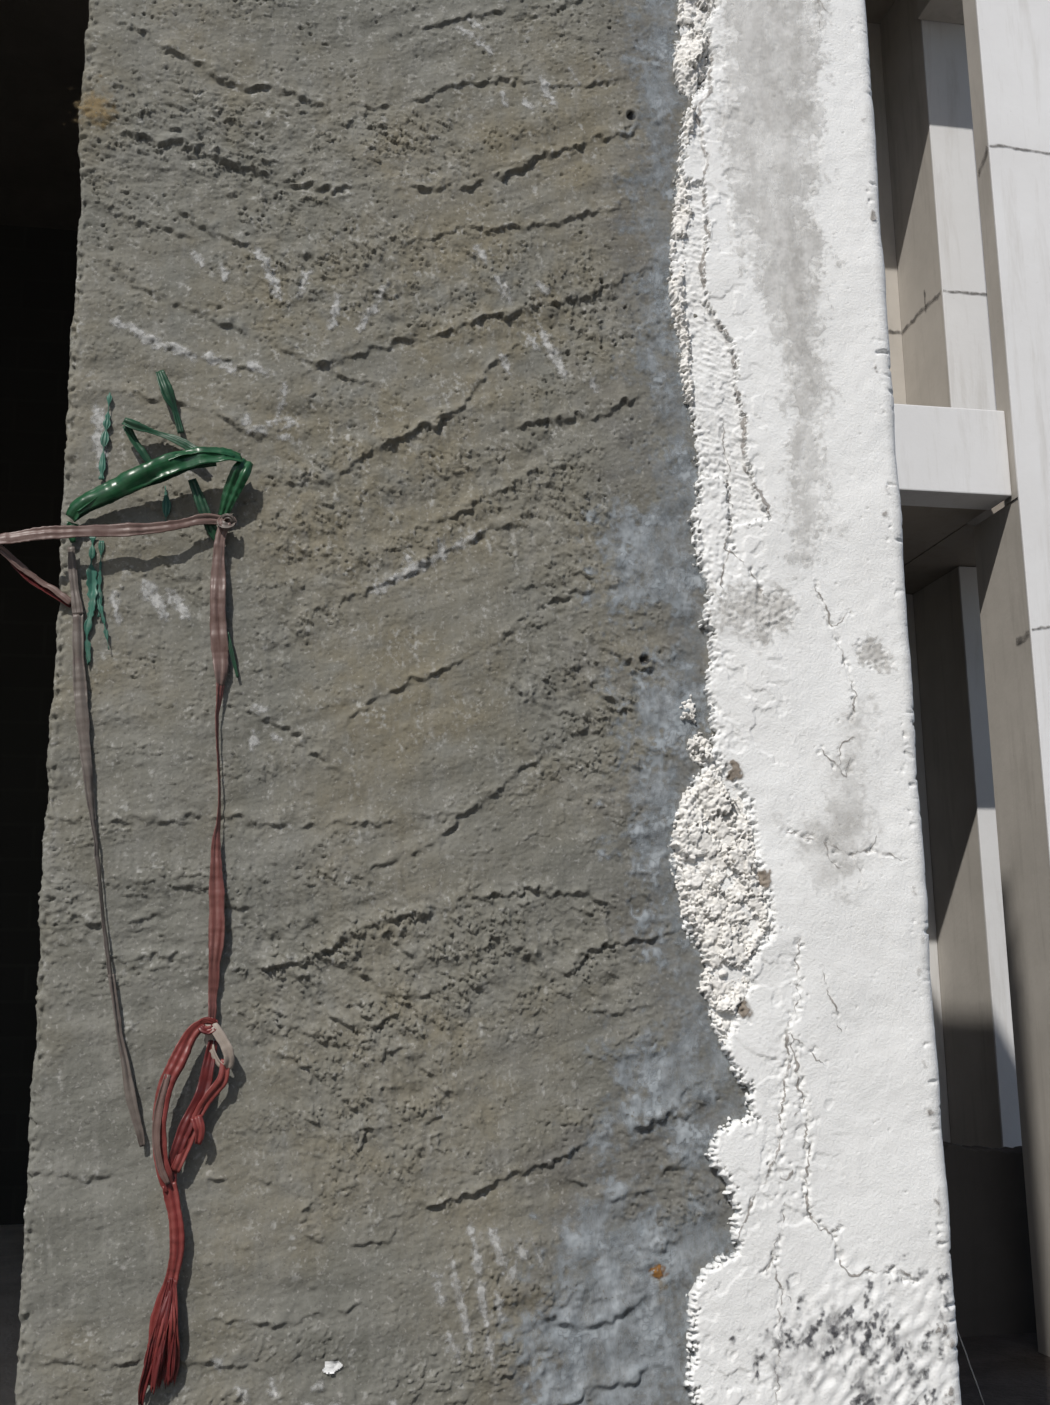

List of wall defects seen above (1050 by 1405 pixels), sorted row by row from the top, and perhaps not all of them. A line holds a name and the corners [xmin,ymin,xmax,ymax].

peeling [501,79,556,108]
flaking render [666,0,845,538]
peeling [139,334,266,376]
peeling [142,579,190,619]
leakage [598,643,711,976]
spalling [667,695,771,1045]
peeling [435,1261,505,1363]
peeling [488,1228,542,1279]
leakage [503,1001,747,1405]
corrosion [641,1242,683,1295]
crack [739,938,910,1394]
leakage [755,1278,946,1405]